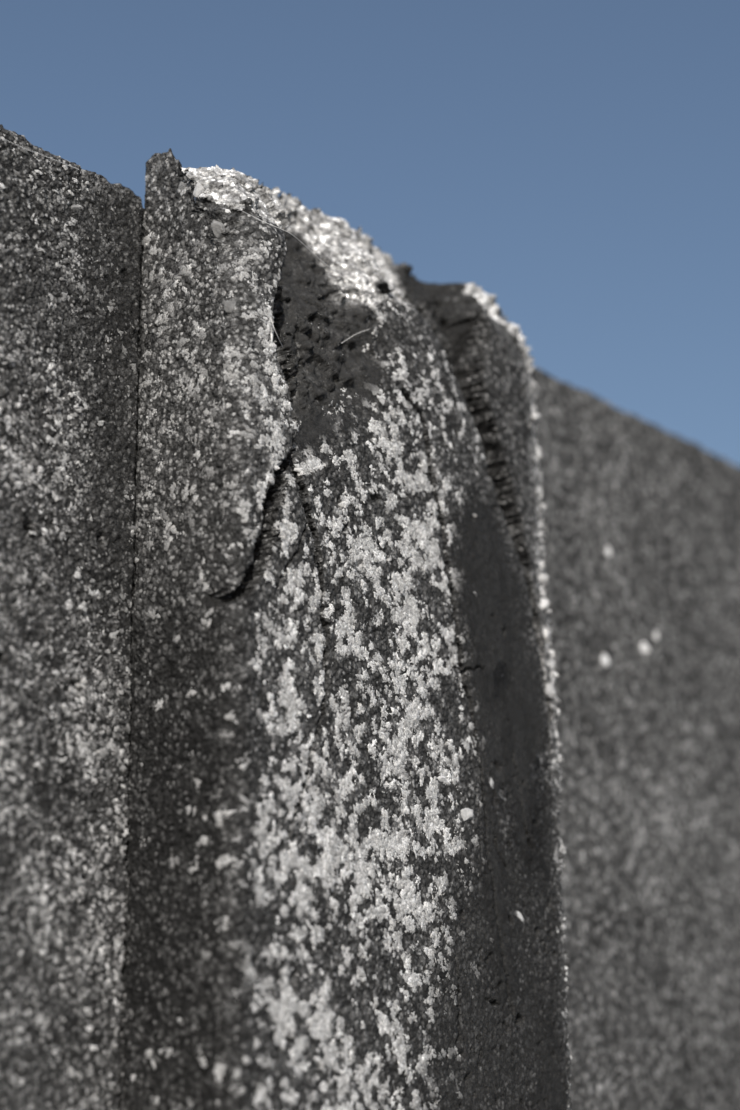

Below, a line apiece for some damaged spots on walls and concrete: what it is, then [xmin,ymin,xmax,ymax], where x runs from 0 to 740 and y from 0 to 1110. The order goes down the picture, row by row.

crack [441,320,481,433]
crack [203,485,277,609]